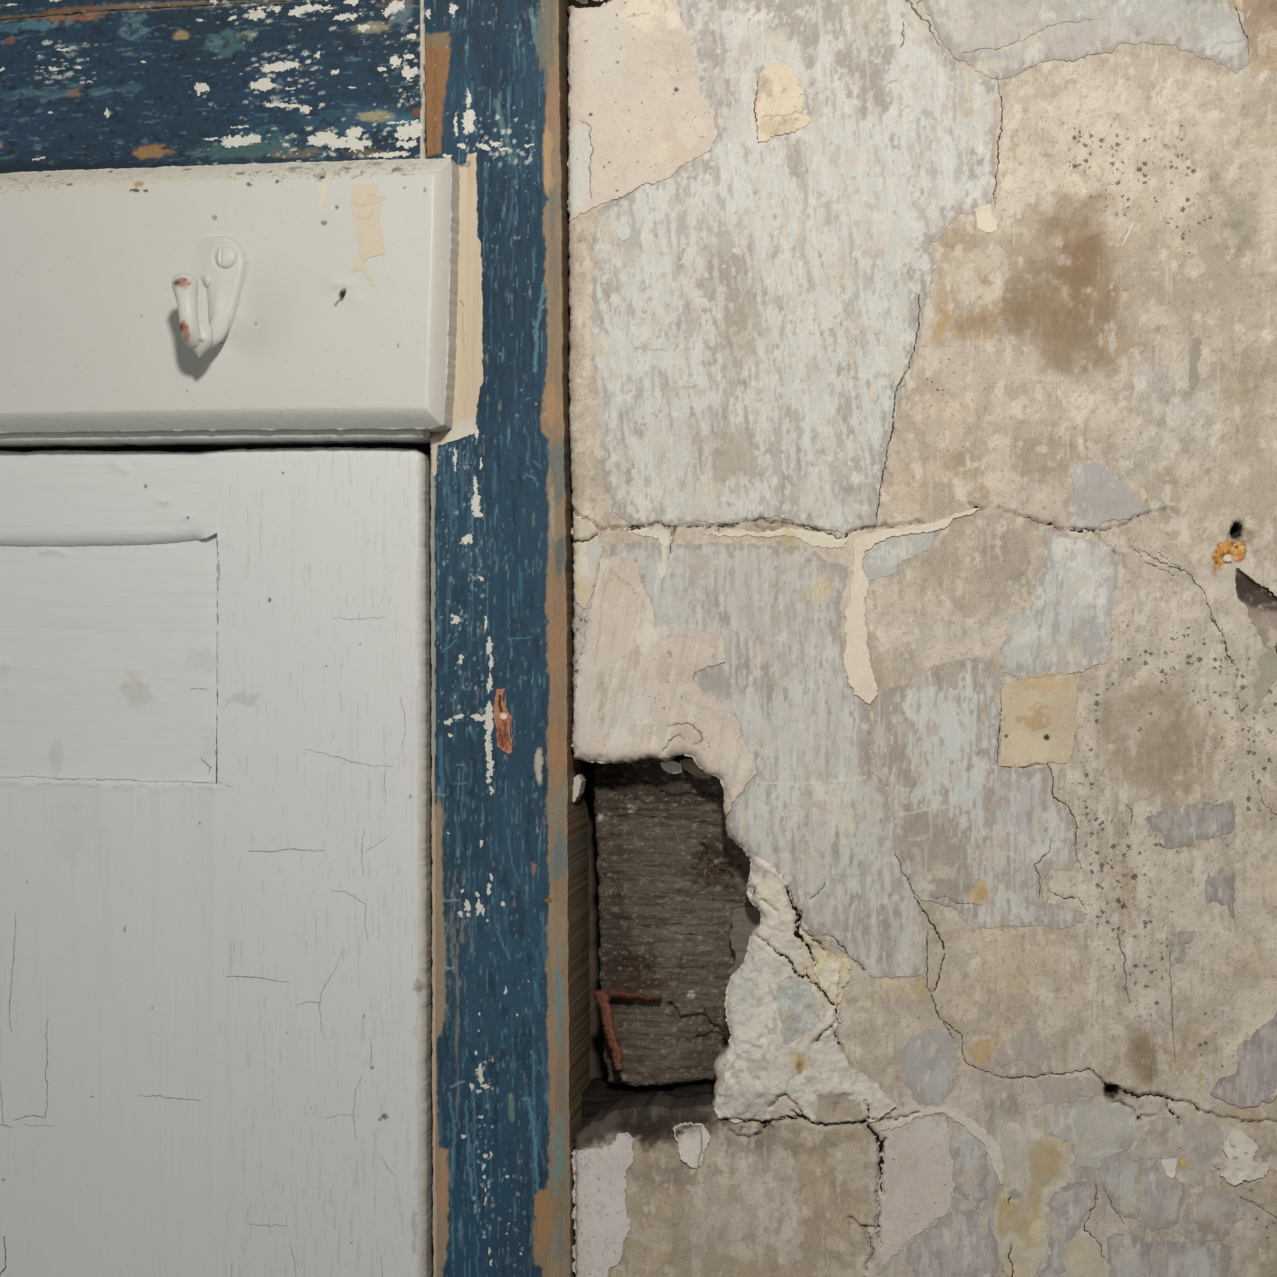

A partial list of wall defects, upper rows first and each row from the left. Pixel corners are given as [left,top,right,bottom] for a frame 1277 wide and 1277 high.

spalling [250,60,312,114]
spalling [228,0,370,32]
spalling [307,119,423,158]
spalling [443,89,508,158]
crack [567,0,608,8]
crack [572,294,923,554]
rust [1212,540,1246,569]
spalling [444,616,513,795]
peeling [567,0,1250,1277]
crack [752,884,866,1050]
crack [894,853,1277,1123]
crack [722,1094,916,1270]